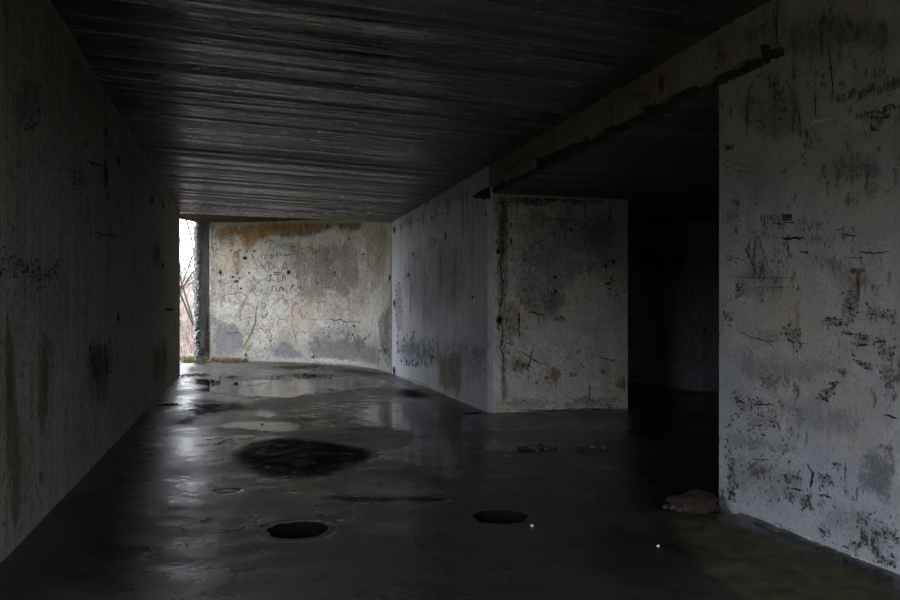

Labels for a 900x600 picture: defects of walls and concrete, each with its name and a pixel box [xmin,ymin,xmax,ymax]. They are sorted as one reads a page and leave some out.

corrosion [216,223,360,246]
crack [210,226,392,352]
water stain [308,313,389,365]
crack [497,205,624,411]
spalling [473,44,785,264]
peeling [724,351,899,568]